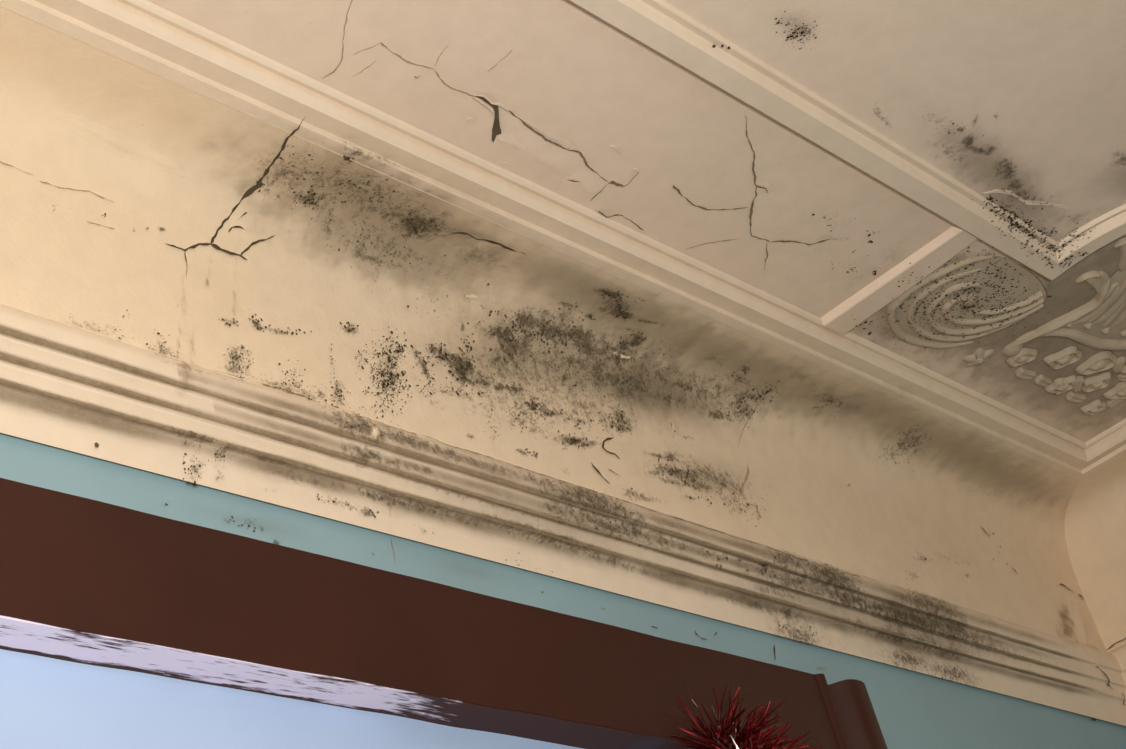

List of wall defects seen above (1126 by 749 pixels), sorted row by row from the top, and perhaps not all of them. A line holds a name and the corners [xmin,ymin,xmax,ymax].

crack [323,0,476,97]
water stain [775,11,818,50]
crack [165,120,303,275]
water stain [256,146,447,271]
crack [509,110,643,230]
crack [673,115,829,270]
water stain [936,118,994,155]
water stain [972,159,1092,268]
water stain [851,240,1093,365]